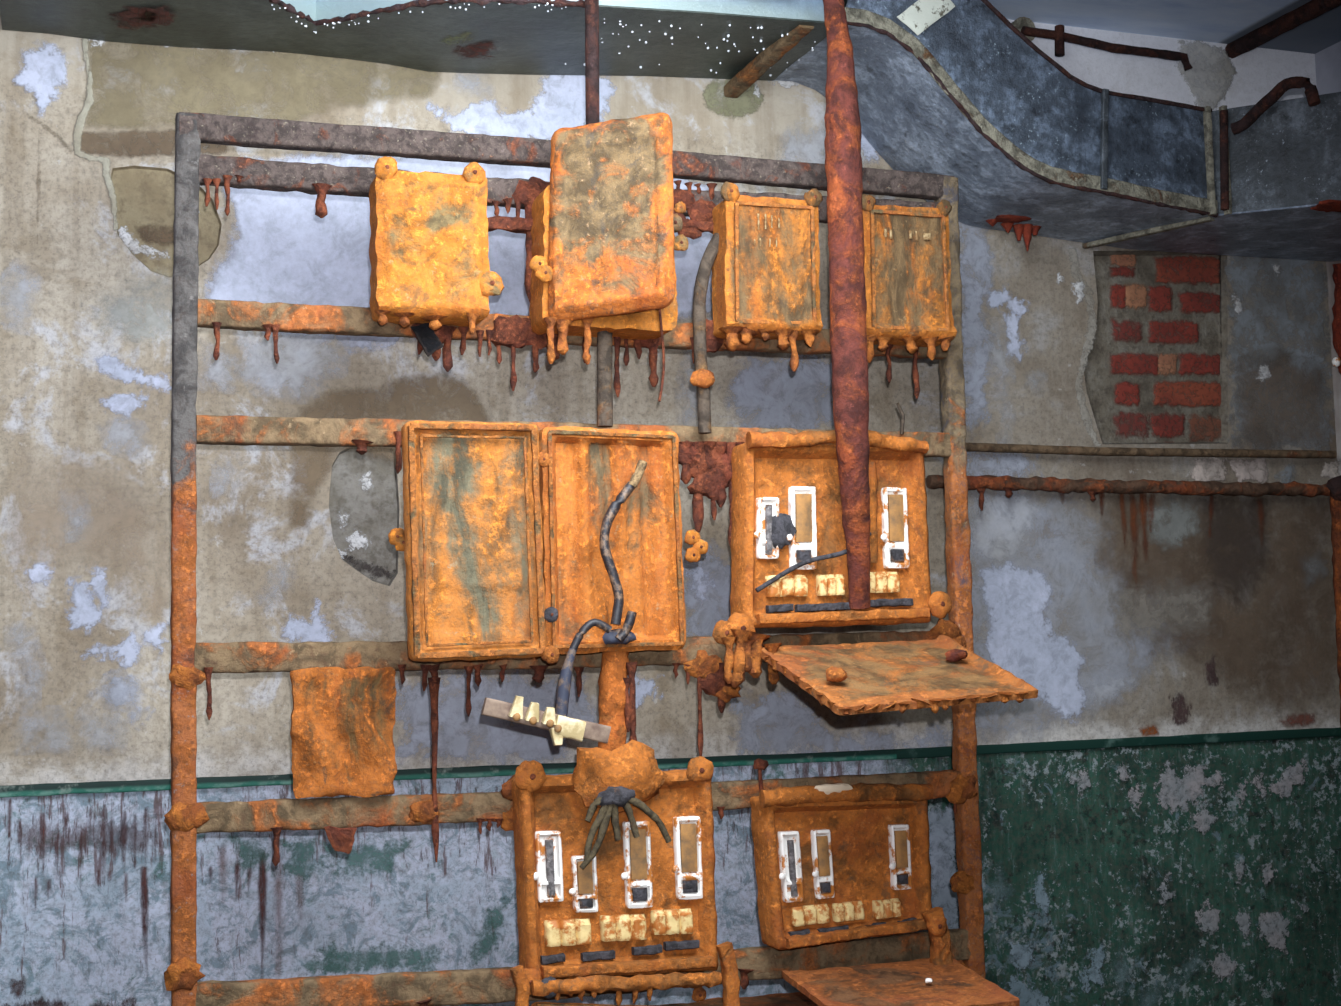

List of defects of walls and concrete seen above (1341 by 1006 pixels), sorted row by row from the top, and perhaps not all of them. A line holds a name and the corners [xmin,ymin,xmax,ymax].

peeling [12,34,67,116]
corrosion [269,0,585,26]
flaking render [73,38,175,277]
peeling [959,222,1029,426]
flaking render [1057,249,1294,484]
flaking render [329,447,400,586]
peeling [966,451,1192,730]
water stain [1103,495,1337,726]
corrosion [40,813,58,855]
corrosion [98,801,210,937]
corrosion [235,827,283,947]
peeling [1115,759,1308,835]